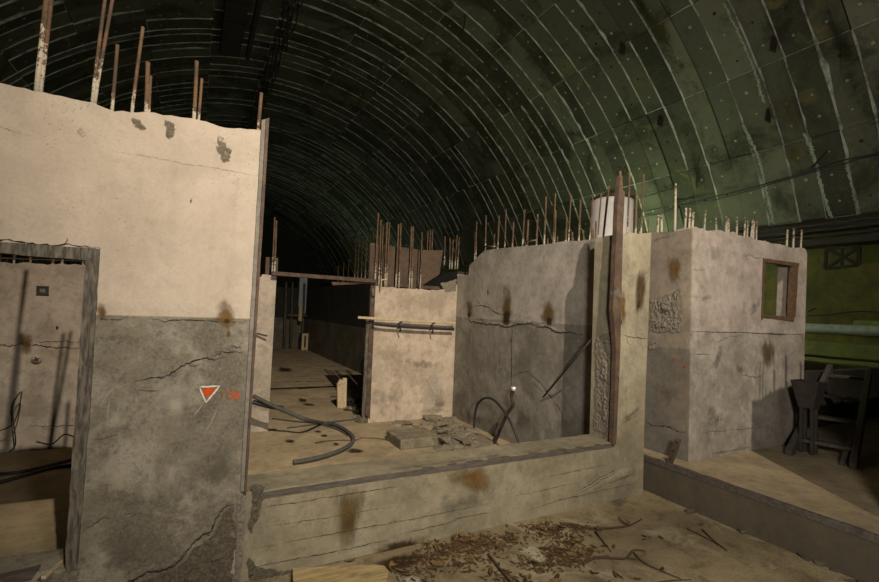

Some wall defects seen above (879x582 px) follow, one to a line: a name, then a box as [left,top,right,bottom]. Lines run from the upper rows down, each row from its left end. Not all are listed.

spalling [130,26,152,130]
spalling [164,121,175,139]
spalling [215,135,232,162]
rust [636,275,645,307]
rust [220,309,232,336]
rust [503,297,511,324]
rust [543,304,553,325]
spalling [648,288,683,350]
crack [135,345,244,391]
crack [467,302,585,420]
rust [341,498,357,535]
crack [118,498,234,582]